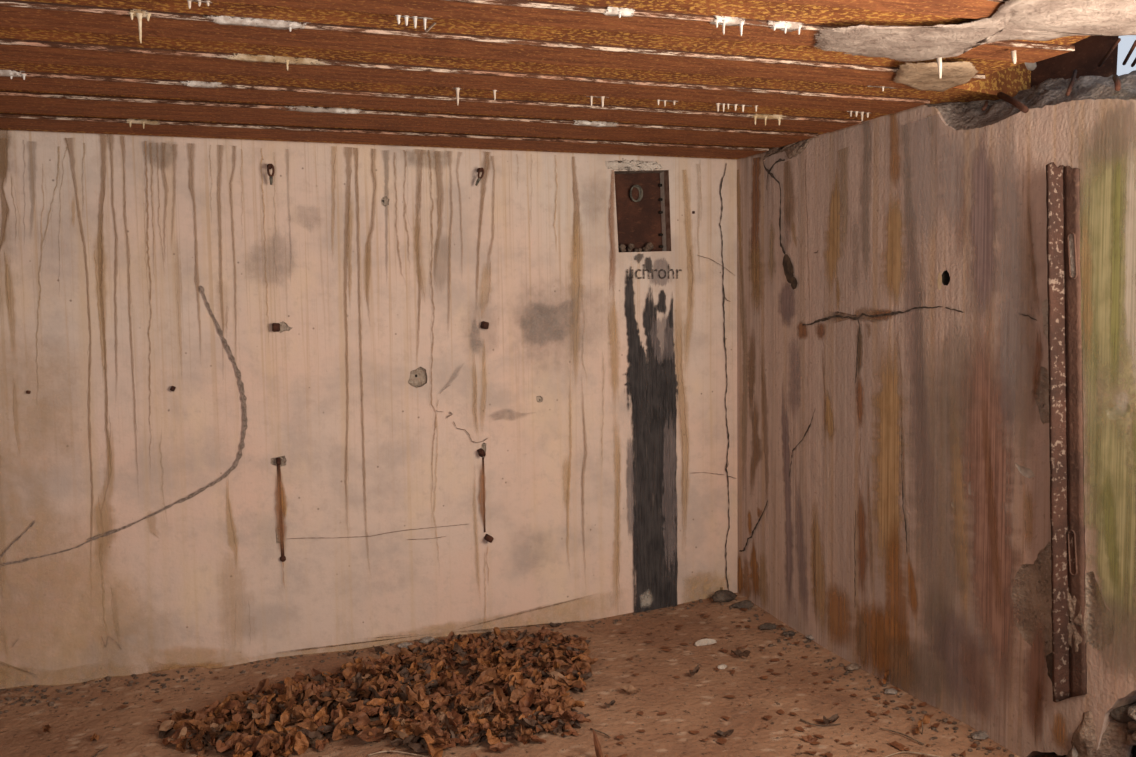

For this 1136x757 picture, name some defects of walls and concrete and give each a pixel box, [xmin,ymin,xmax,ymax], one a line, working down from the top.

water stain [187,0,307,32]
water stain [603,7,635,18]
water stain [710,15,745,36]
water stain [768,21,802,35]
water stain [224,53,329,71]
spalling [1025,36,1136,96]
water stain [282,105,369,114]
spalling [997,92,1029,113]
crack [763,158,818,290]
crack [803,306,963,383]
crack [789,411,815,477]
rust [276,478,286,543]